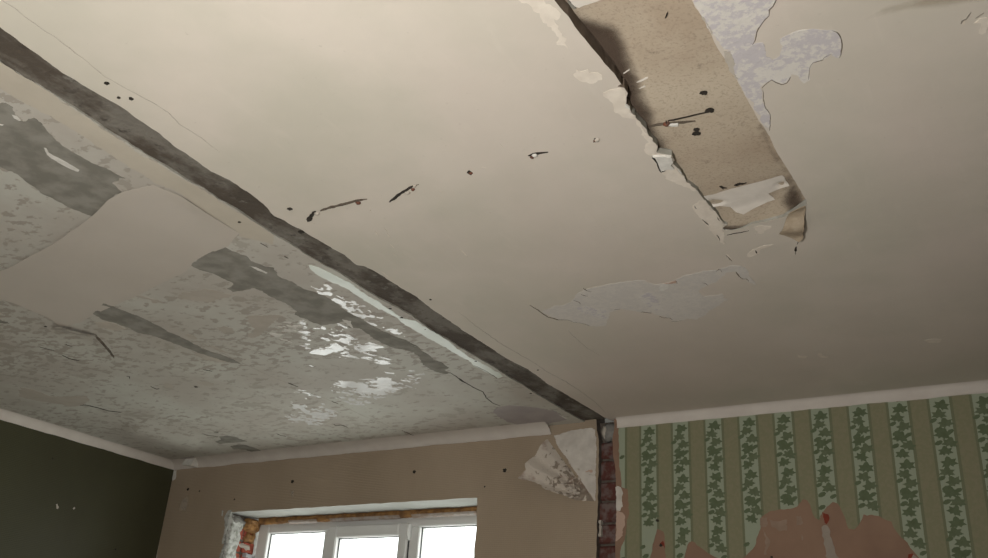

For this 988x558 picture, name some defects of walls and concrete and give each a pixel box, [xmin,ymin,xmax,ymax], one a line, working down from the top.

peeling [694,0,843,131]
peeling [603,88,771,257]
flaking render [493,405,597,501]